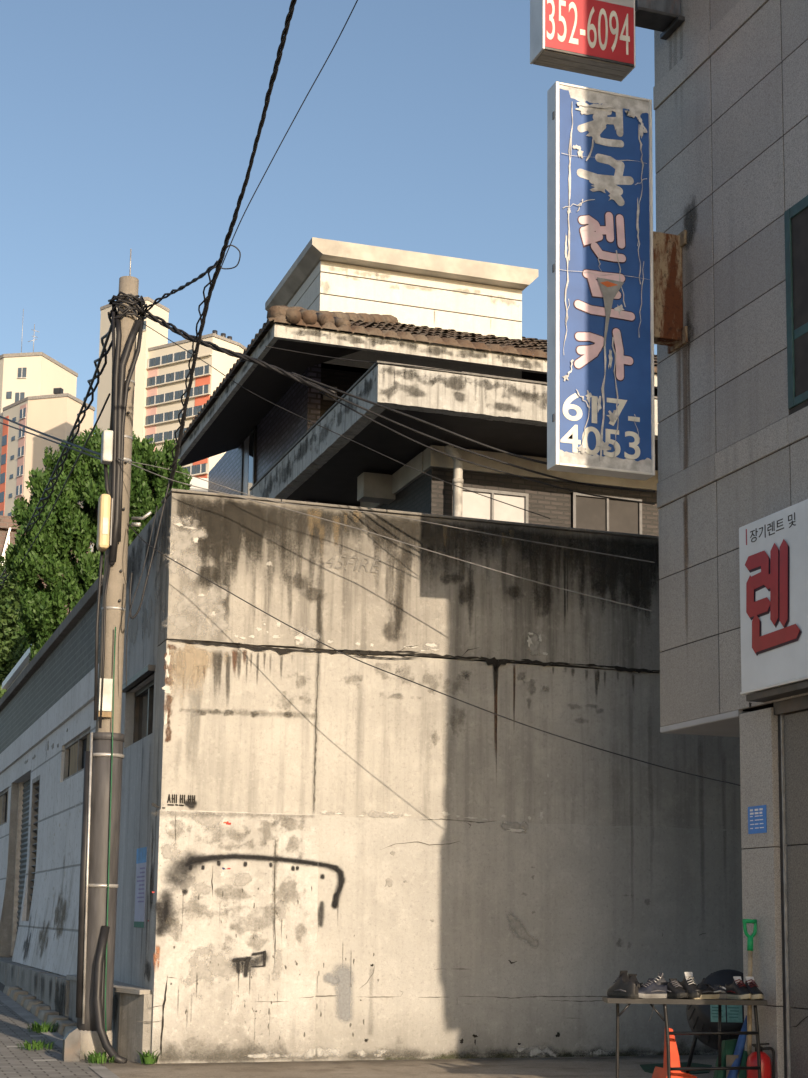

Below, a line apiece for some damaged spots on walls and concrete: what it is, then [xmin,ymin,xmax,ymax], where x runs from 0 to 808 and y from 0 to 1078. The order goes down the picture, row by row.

leakage [126,368,659,639]